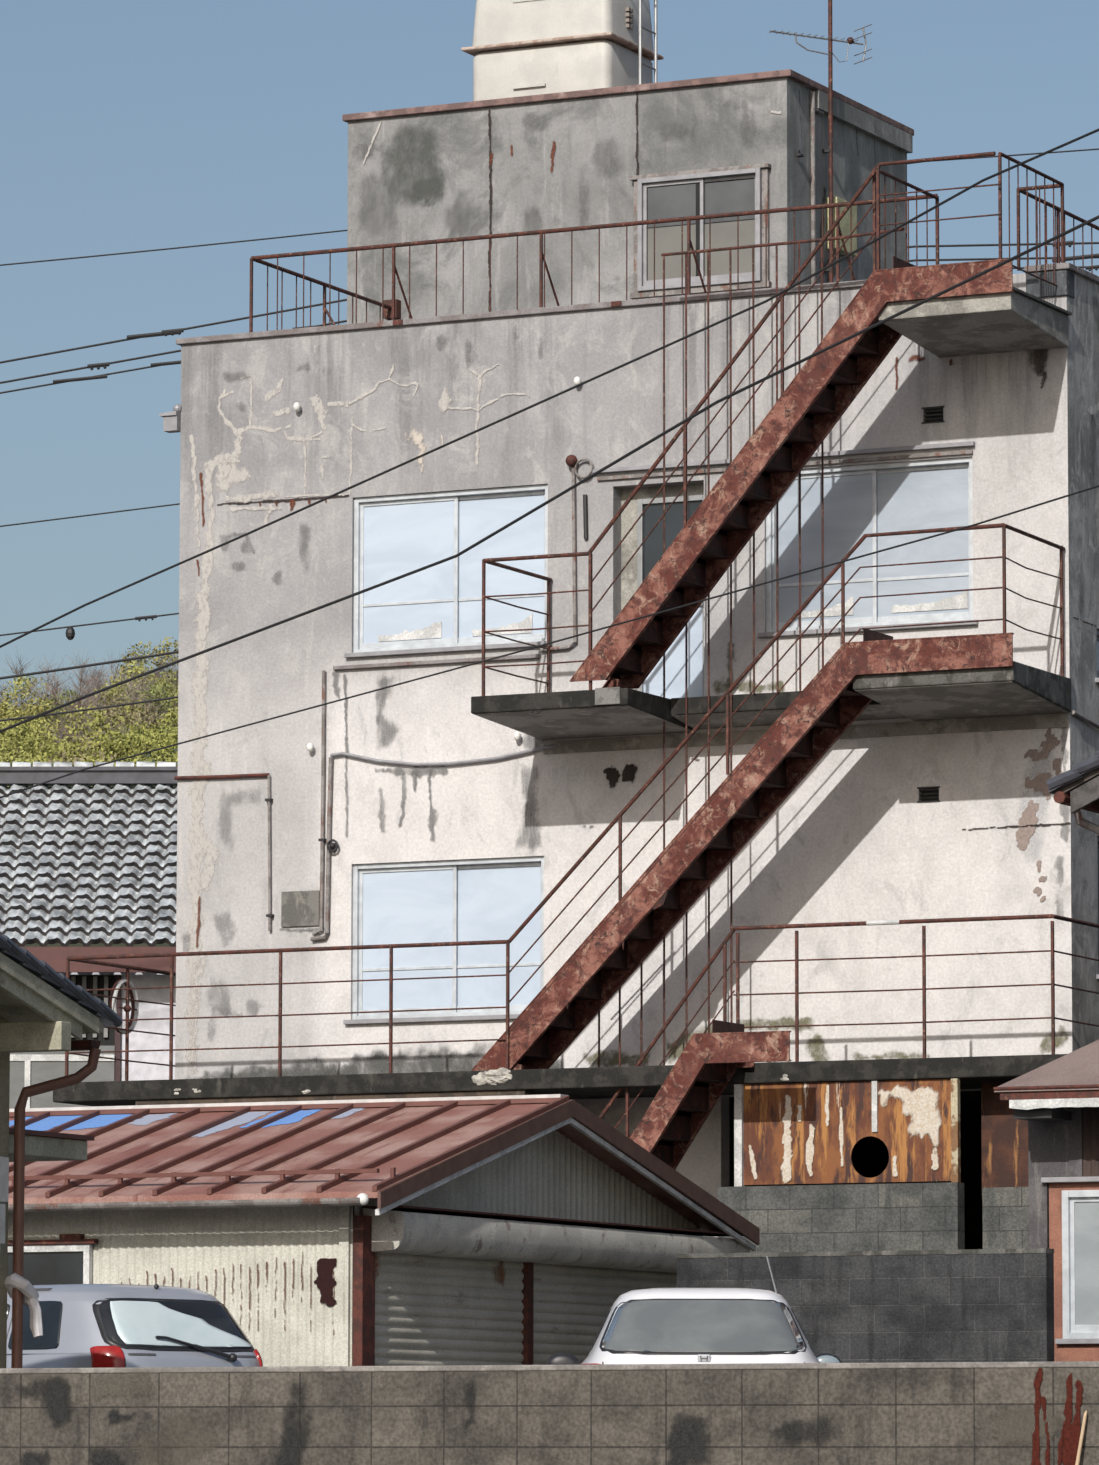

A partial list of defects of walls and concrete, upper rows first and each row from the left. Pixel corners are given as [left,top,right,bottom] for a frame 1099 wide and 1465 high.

leakage [363,122,444,203]
crack [204,364,530,529]
leakage [376,677,396,745]
leakage [332,671,348,836]
leakage [375,766,447,840]
spalling [1016,728,1063,902]
leakage [741,1017,811,1030]
leakage [199,1049,480,1079]
leakage [19,1379,71,1425]
leakage [108,1409,131,1423]
leakage [275,1385,307,1465]
rust [1031,1368,1083,1465]